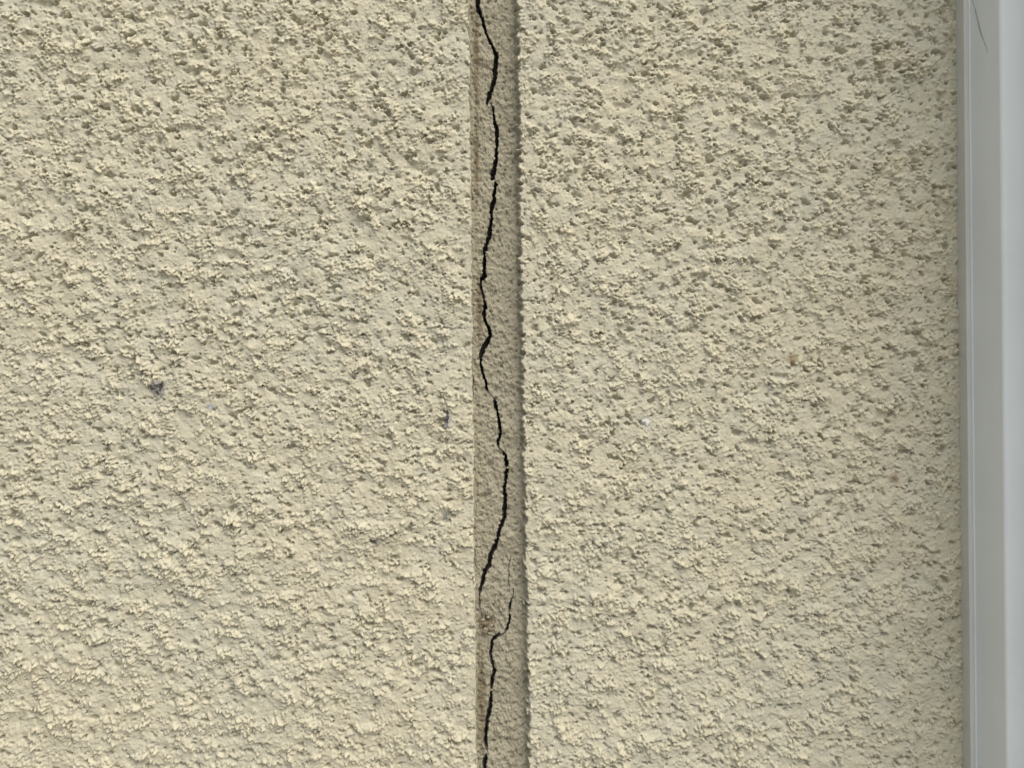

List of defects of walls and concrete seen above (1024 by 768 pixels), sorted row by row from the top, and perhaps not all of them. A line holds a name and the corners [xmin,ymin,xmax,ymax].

crack [472,0,514,768]